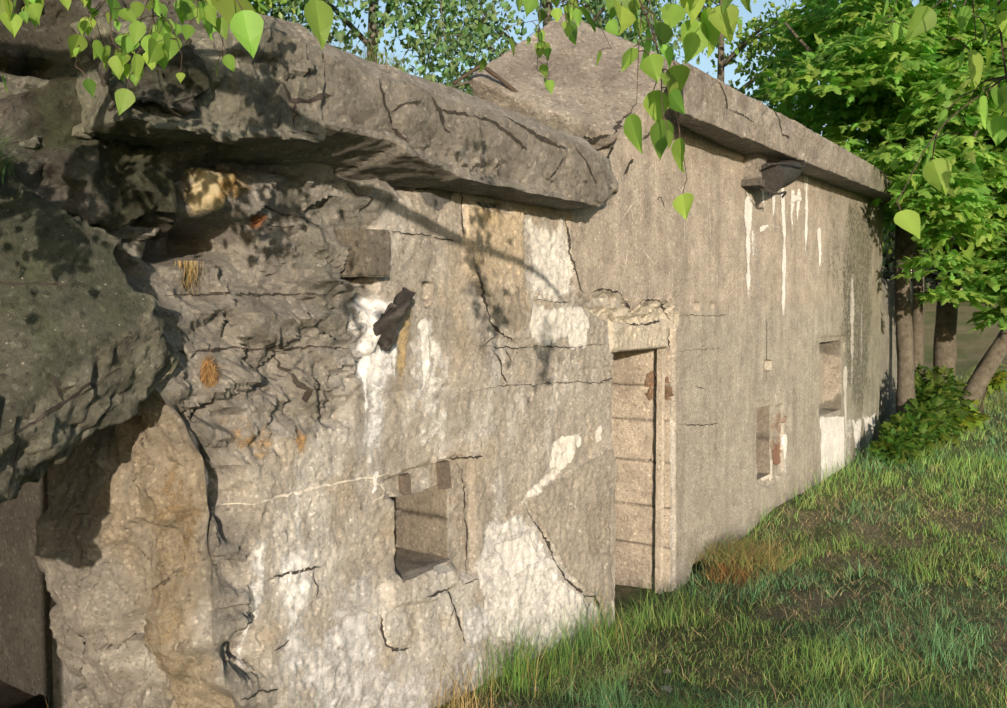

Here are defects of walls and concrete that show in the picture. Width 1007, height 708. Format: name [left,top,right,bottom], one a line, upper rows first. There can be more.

leakage [346,297,400,494]
leakage [410,318,448,450]
crack [392,193,613,392]
peeling [493,217,615,350]
leakage [744,175,872,462]
crack [215,473,392,511]
crack [522,499,600,614]
crack [380,617,413,652]